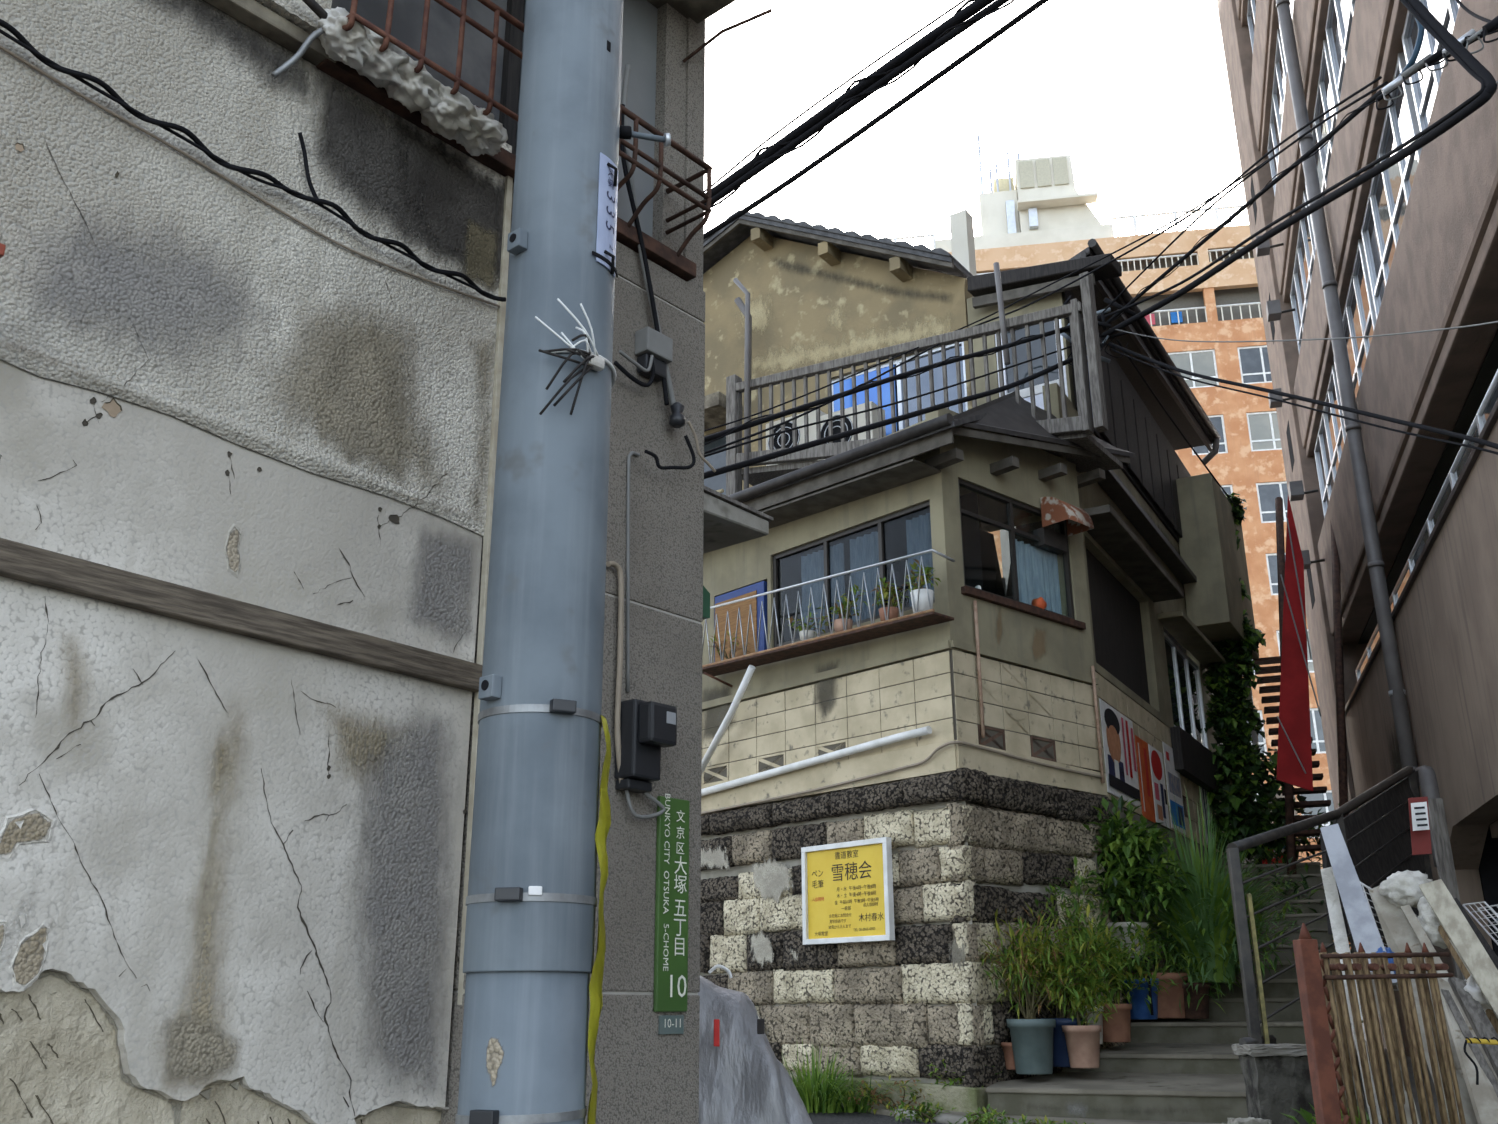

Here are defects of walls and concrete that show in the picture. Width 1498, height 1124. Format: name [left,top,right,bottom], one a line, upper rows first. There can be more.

damp [155,0,505,288]
flaking render [224,523,243,578]
flaking render [0,807,58,862]
crack [19,603,228,991]
flaking render [0,914,308,1124]
damp [170,913,236,1078]
crack [261,682,355,1116]
damp [341,720,440,1081]
flaking render [355,1105,442,1124]